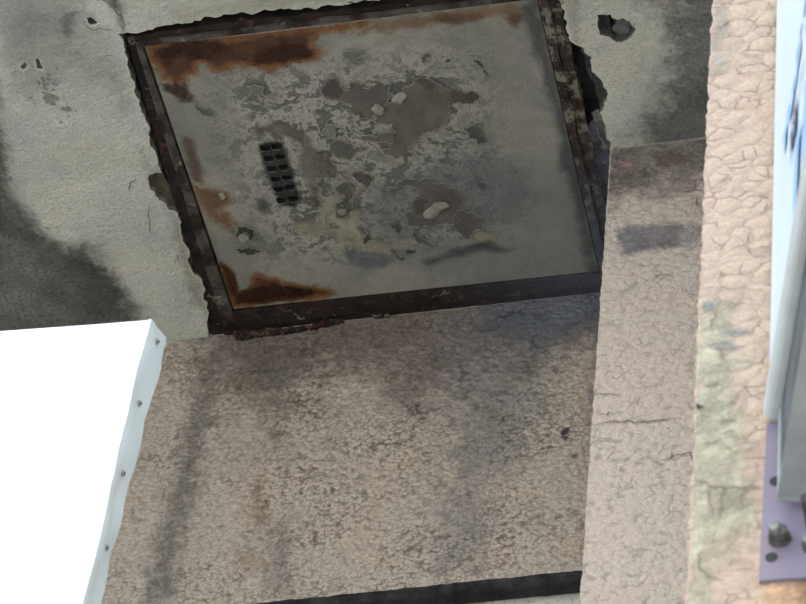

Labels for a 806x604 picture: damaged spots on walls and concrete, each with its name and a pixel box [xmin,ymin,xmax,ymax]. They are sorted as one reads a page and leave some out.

spalling [597,14,635,41]
rust [146,6,519,102]
peeling [320,76,479,160]
peeling [463,124,488,160]
peeling [332,172,371,219]
water stain [0,156,131,331]
peeling [235,225,261,256]
peeling [383,177,485,262]
rust [220,264,335,308]